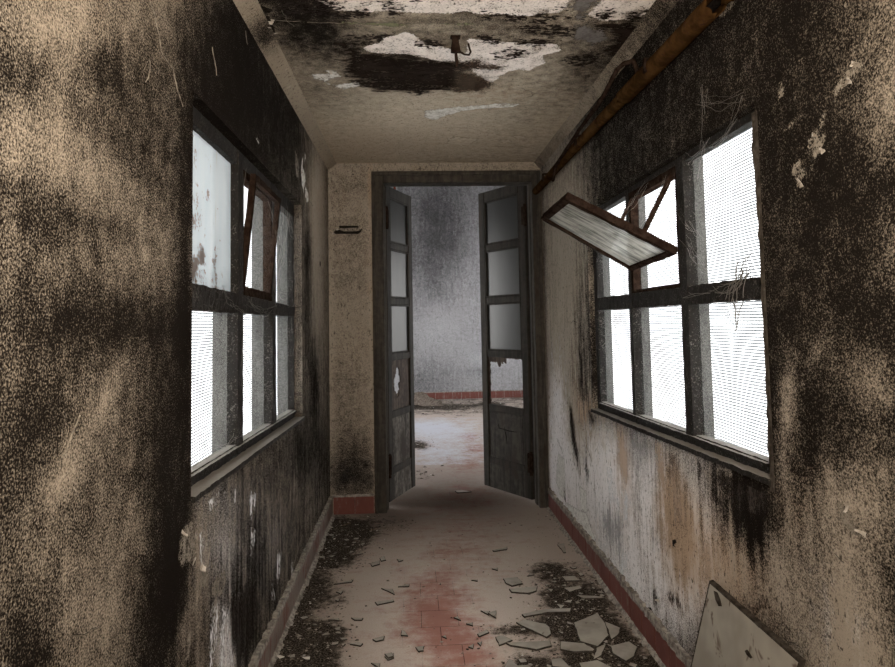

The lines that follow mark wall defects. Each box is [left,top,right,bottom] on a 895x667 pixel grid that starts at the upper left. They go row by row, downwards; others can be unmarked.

water stain [272,0,423,19]
flaking render [320,0,571,16]
flaking render [588,0,655,21]
flaking render [364,32,561,82]
water stain [334,0,648,96]
flaking render [424,103,519,120]
flaking render [295,151,308,202]
water stain [569,407,589,482]
flaking render [178,521,226,599]
water stain [210,574,258,667]